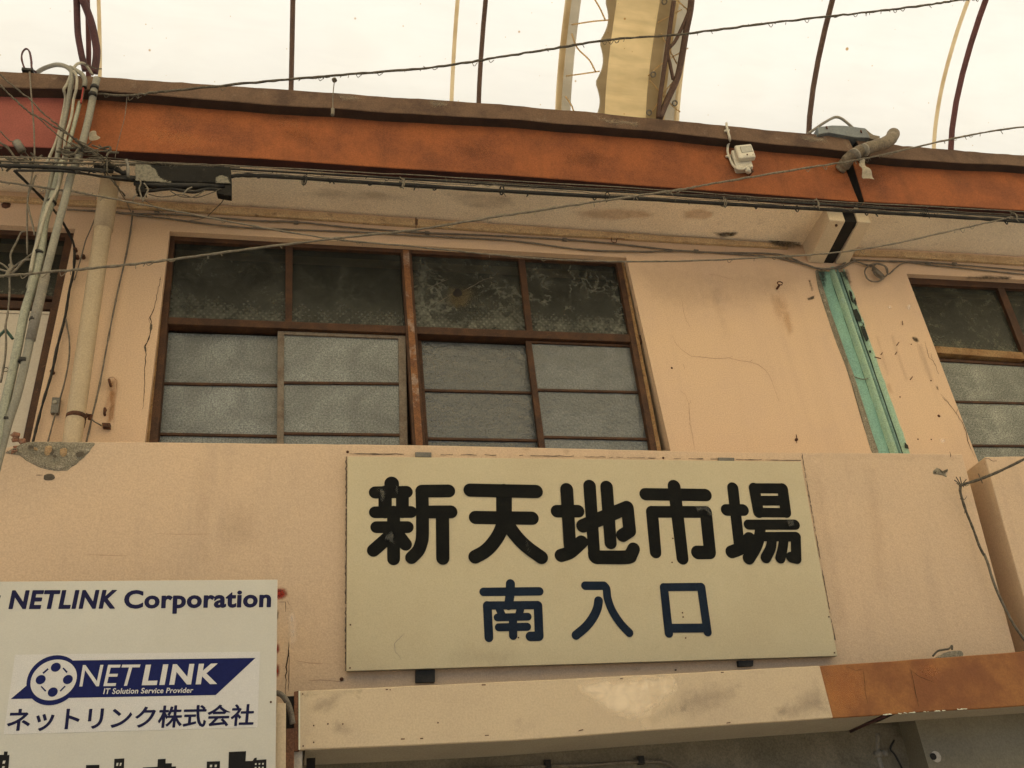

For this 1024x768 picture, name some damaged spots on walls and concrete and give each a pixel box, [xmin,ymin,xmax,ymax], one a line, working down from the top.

crack [142,277,161,409]
spalling [6,442,95,480]